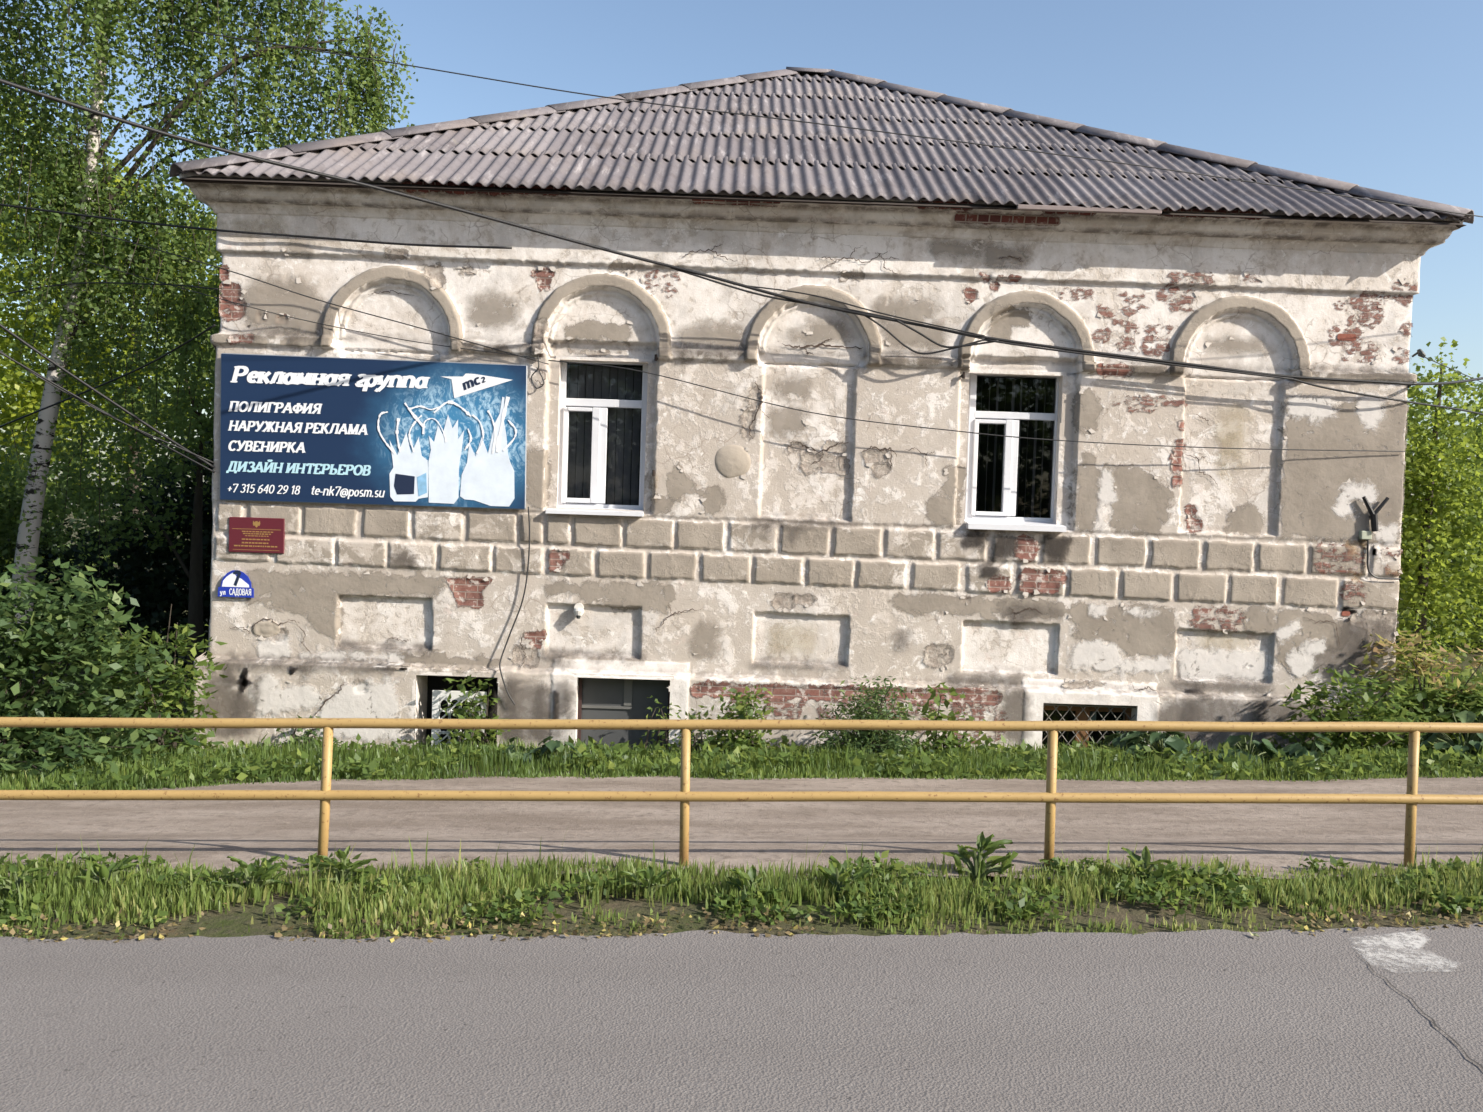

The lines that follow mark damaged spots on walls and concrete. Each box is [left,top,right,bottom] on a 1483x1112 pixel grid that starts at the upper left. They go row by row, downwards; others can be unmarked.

peeling [219,265,326,345]
spalling [385,248,478,290]
peeling [470,295,516,326]
flaking render [530,266,556,291]
peeling [530,315,633,358]
peeling [1205,337,1264,352]
flaking render [1328,278,1418,364]
spalling [739,377,891,478]
peeling [1059,272,1214,536]
peeling [889,394,1409,673]
peeling [245,568,493,660]
flaking render [690,641,1007,744]